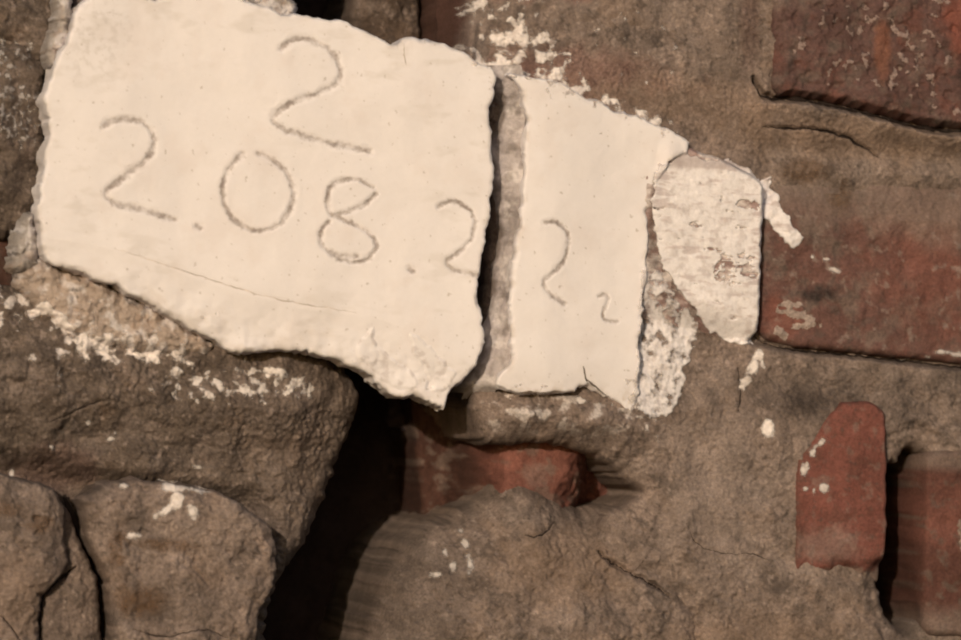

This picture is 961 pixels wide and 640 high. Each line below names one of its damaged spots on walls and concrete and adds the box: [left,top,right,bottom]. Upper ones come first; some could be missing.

crack [750,77,961,157]
crack [450,65,525,400]
flaking render [634,152,804,418]
spalling [773,300,822,341]
crack [384,398,412,431]